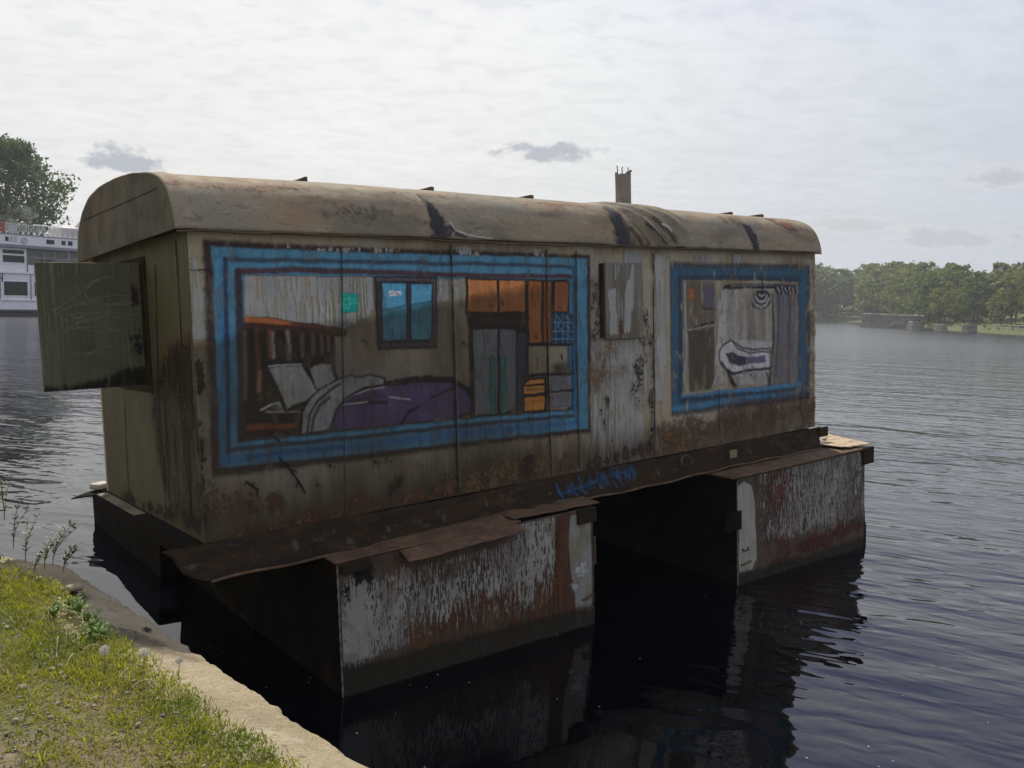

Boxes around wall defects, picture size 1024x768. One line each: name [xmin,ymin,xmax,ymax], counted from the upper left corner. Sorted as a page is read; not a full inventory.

peeling [590,254,667,468]
peeling [340,517,556,668]
rust [400,515,575,653]
peeling [569,514,593,610]
peeling [738,452,864,573]